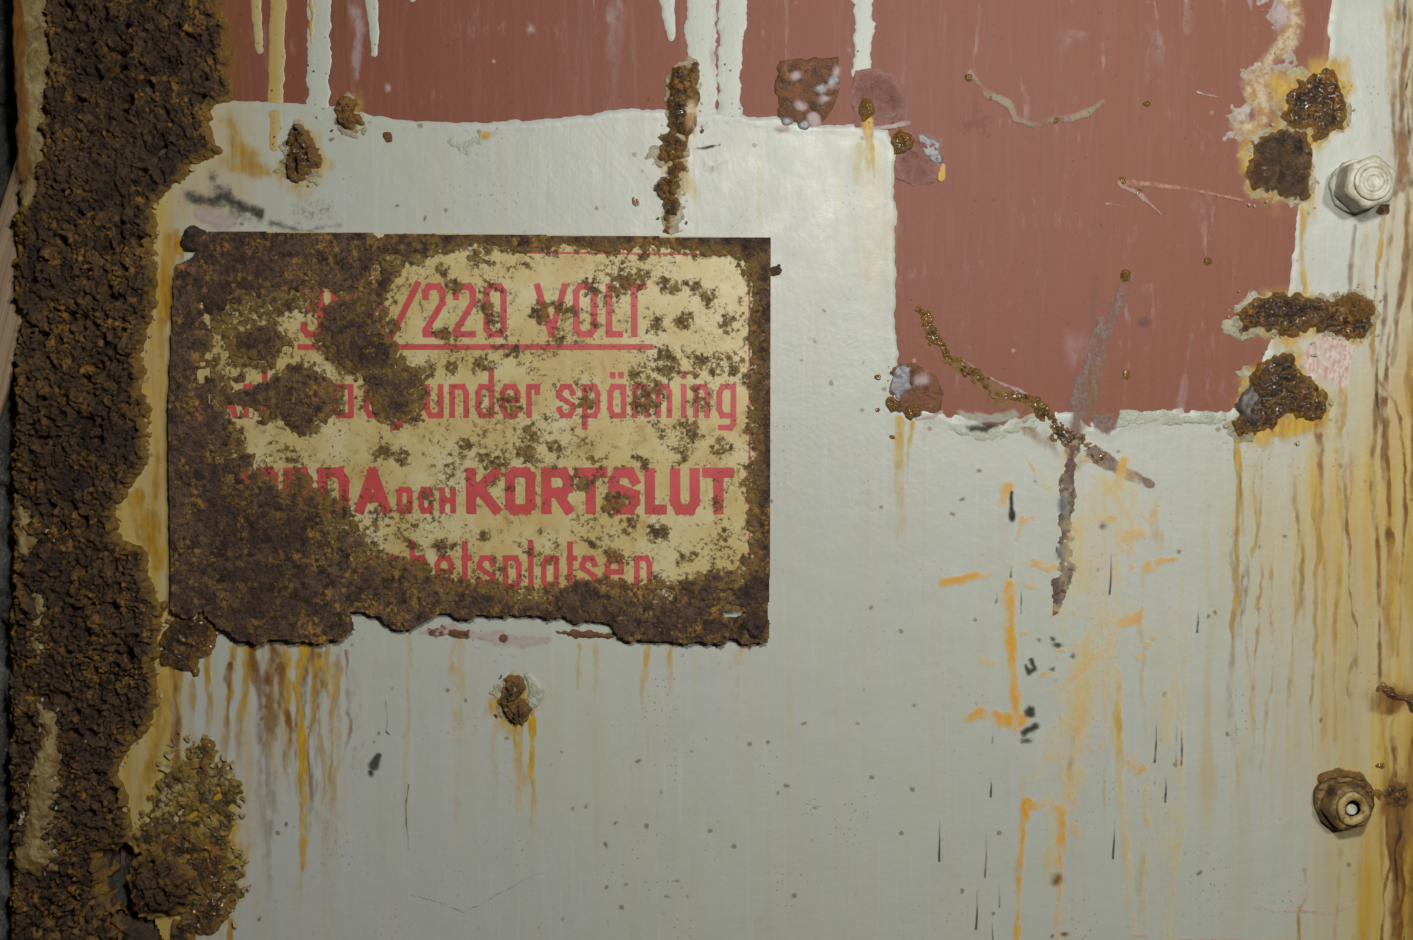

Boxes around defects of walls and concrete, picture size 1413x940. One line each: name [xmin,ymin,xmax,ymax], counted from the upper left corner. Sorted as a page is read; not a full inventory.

peeling [1223,0,1304,142]
rust [8,0,782,940]
rust [940,572,990,586]
peeling [949,400,1050,441]
rust [965,580,1054,743]
rust [1001,482,1034,540]
rust [1112,609,1143,638]
peeling [1091,409,1227,434]
rust [1221,46,1413,715]
rust [1101,669,1146,808]
rust [1014,791,1079,940]
rust [1374,735,1413,940]